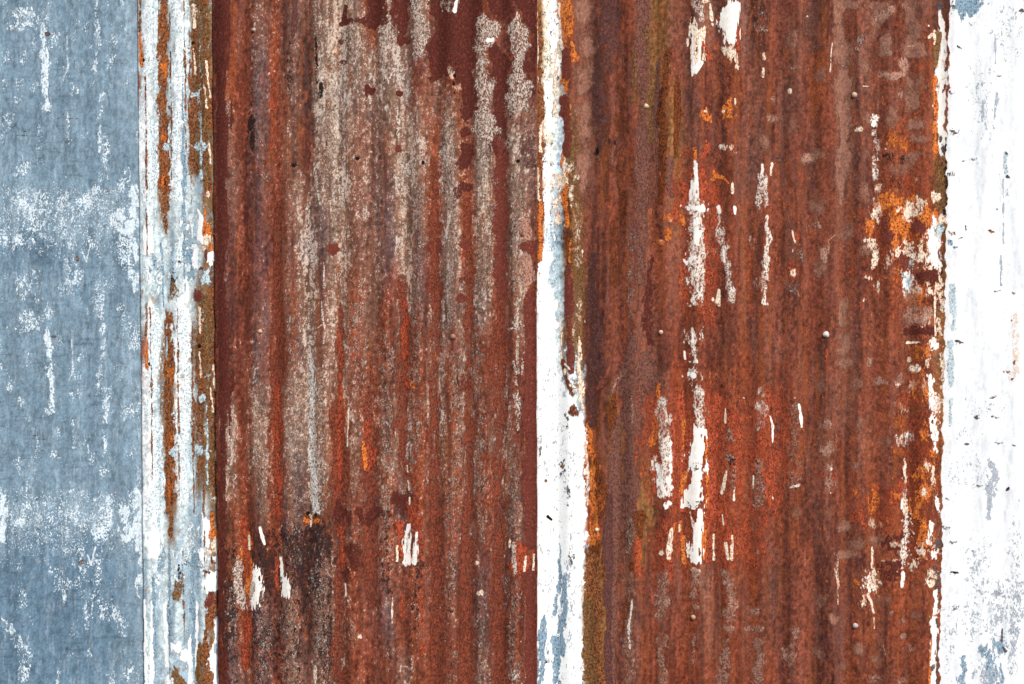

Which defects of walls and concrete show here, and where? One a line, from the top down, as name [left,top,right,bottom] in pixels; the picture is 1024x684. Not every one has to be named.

corrosion [555,0,580,157]
corrosion [587,0,625,288]
corrosion [653,47,730,327]
corrosion [699,97,738,129]
peeling [679,0,768,97]
corrosion [138,0,537,684]
corrosion [561,198,792,684]
peeling [606,140,924,684]
corrosion [849,123,967,607]
peeling [835,384,1024,684]
peeling [869,283,1010,520]